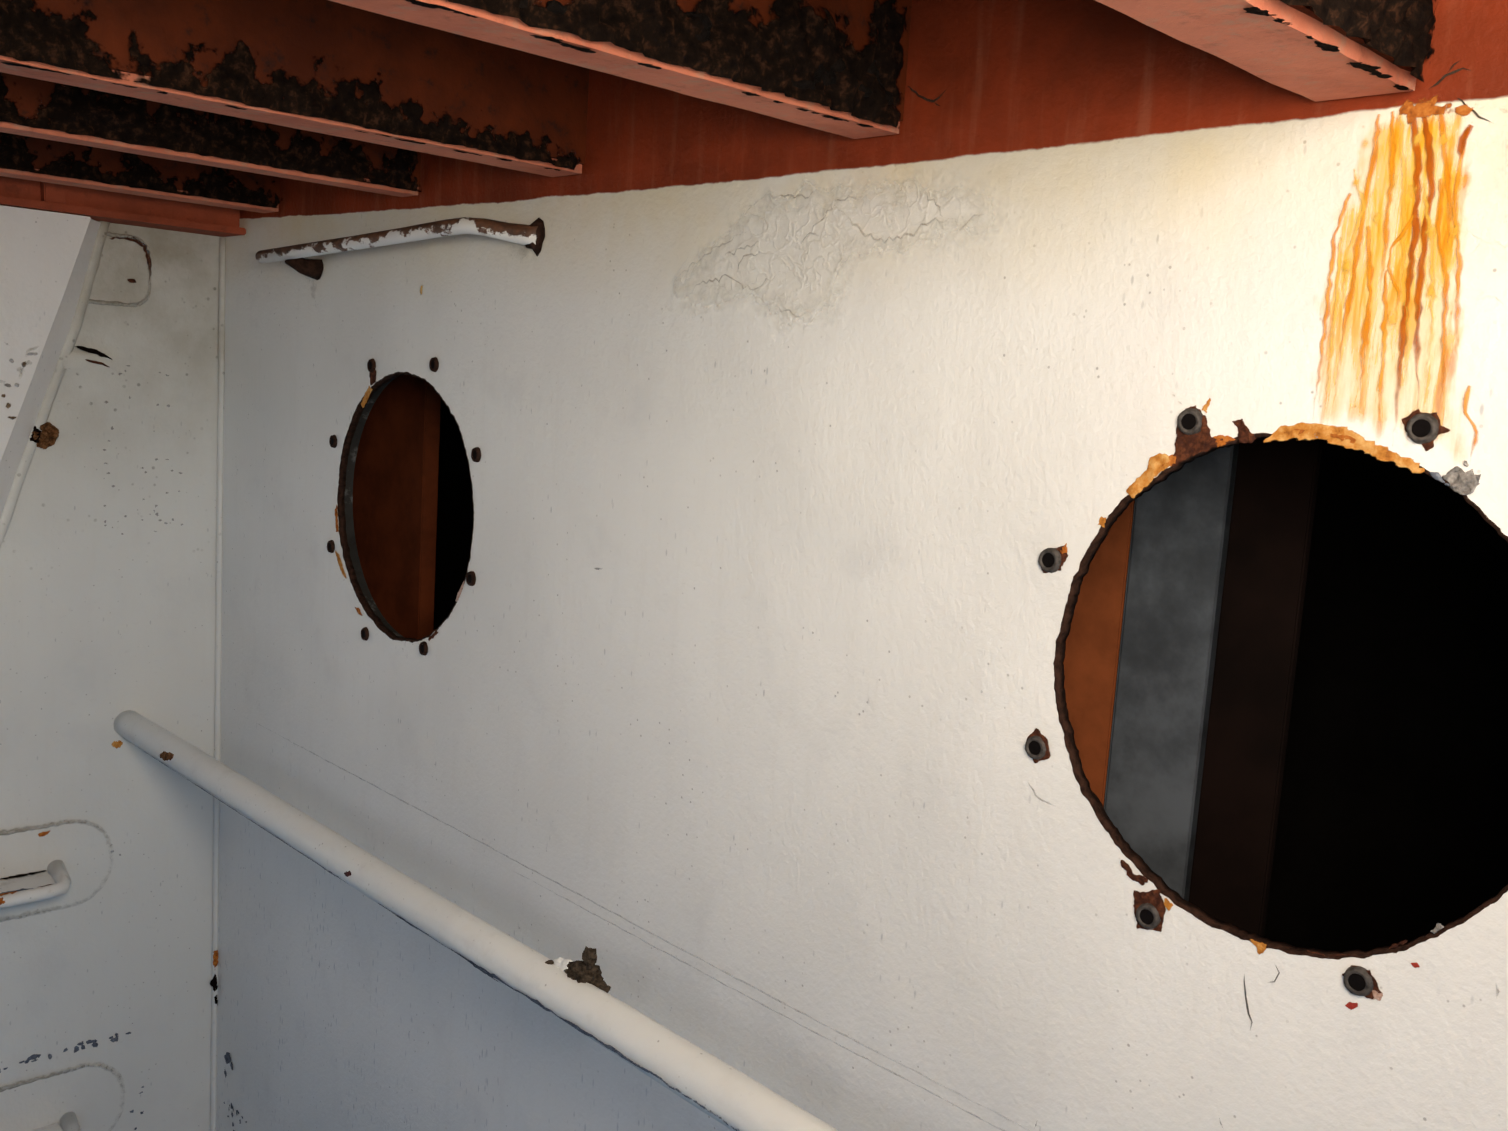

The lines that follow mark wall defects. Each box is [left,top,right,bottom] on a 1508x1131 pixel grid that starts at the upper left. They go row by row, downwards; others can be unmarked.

rust [1126,0,1473,498]
rust [30,422,59,449]
rust [1463,386,1478,445]